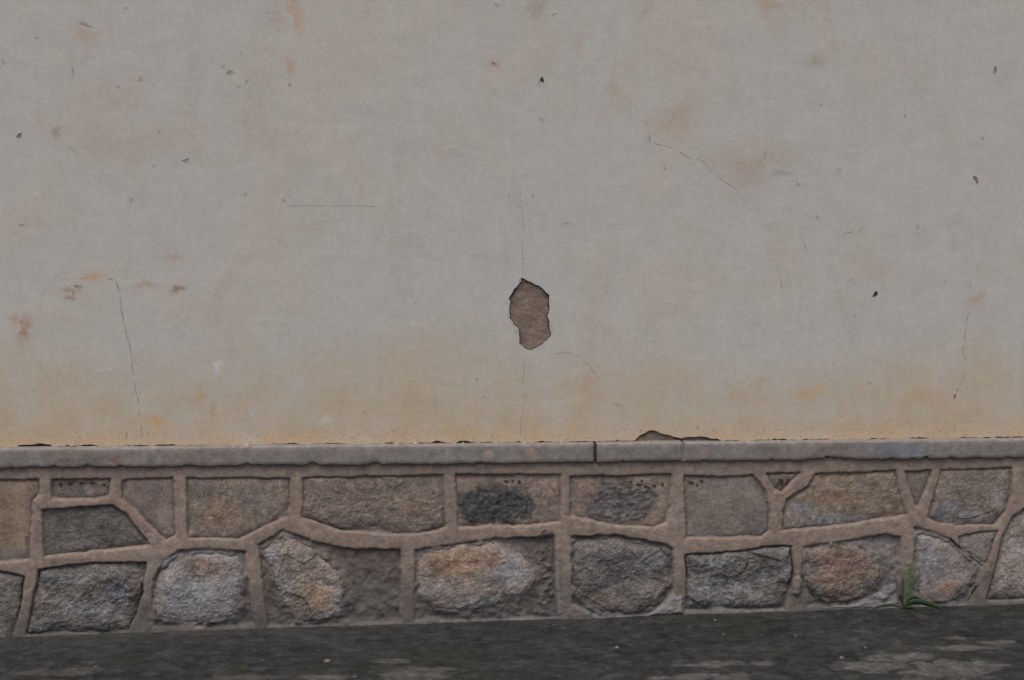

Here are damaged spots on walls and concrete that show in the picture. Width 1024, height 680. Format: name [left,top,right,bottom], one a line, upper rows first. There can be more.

crack [108,278,142,440]
damp [0,281,1024,465]
flaking render [507,277,553,350]